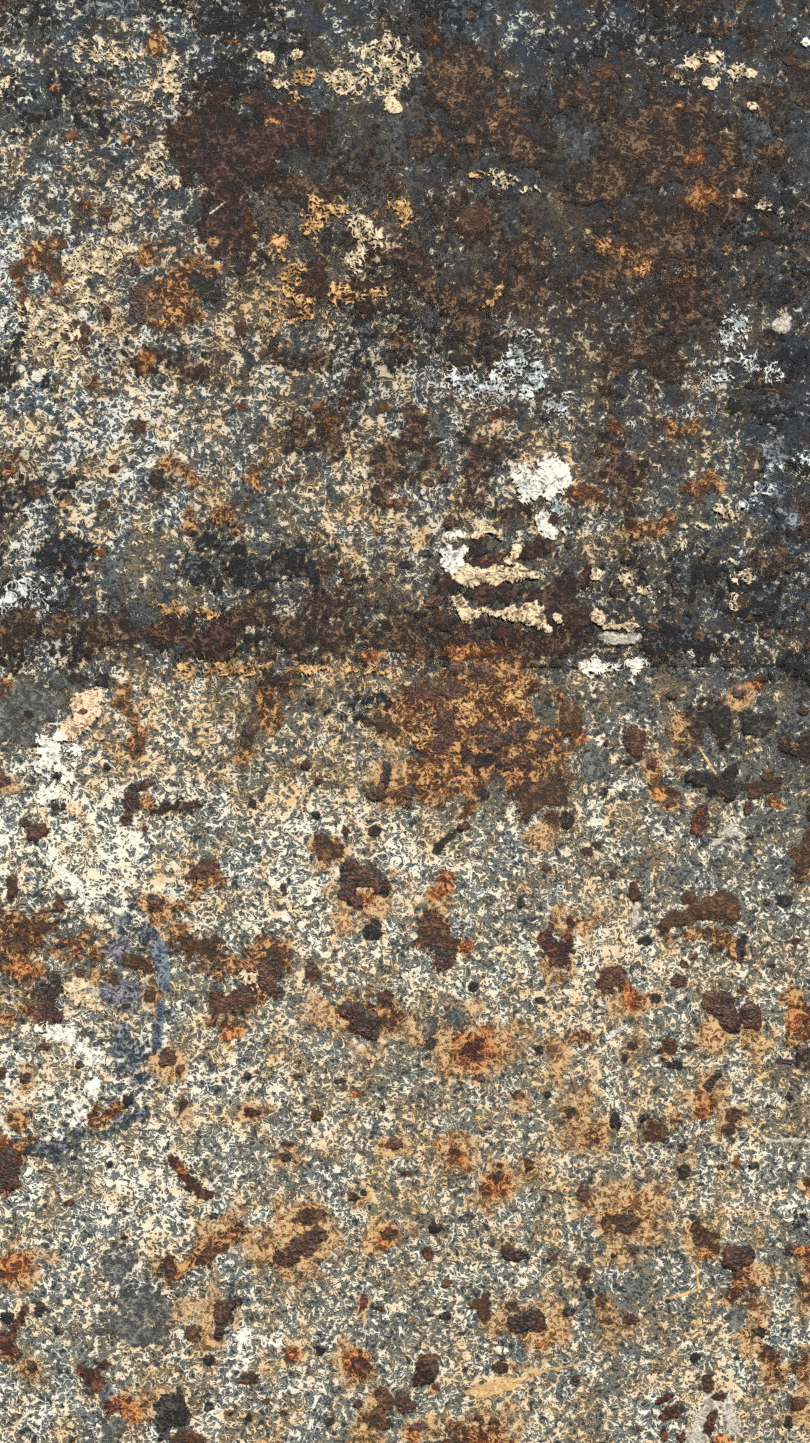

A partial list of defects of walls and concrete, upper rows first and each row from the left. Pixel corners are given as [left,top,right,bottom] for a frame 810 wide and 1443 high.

corrosion [0,0,810,871]
corrosion [308,811,399,940]
corrosion [0,858,621,1154]
corrosion [596,891,748,1018]
corrosion [0,1045,38,1198]
corrosion [0,1241,57,1382]
corrosion [76,1359,288,1443]
corrosion [170,1289,244,1366]
corrosion [148,1154,342,1288]
corrosion [283,1339,525,1443]
corrosion [469,1291,575,1379]
corrosion [489,1241,558,1263]